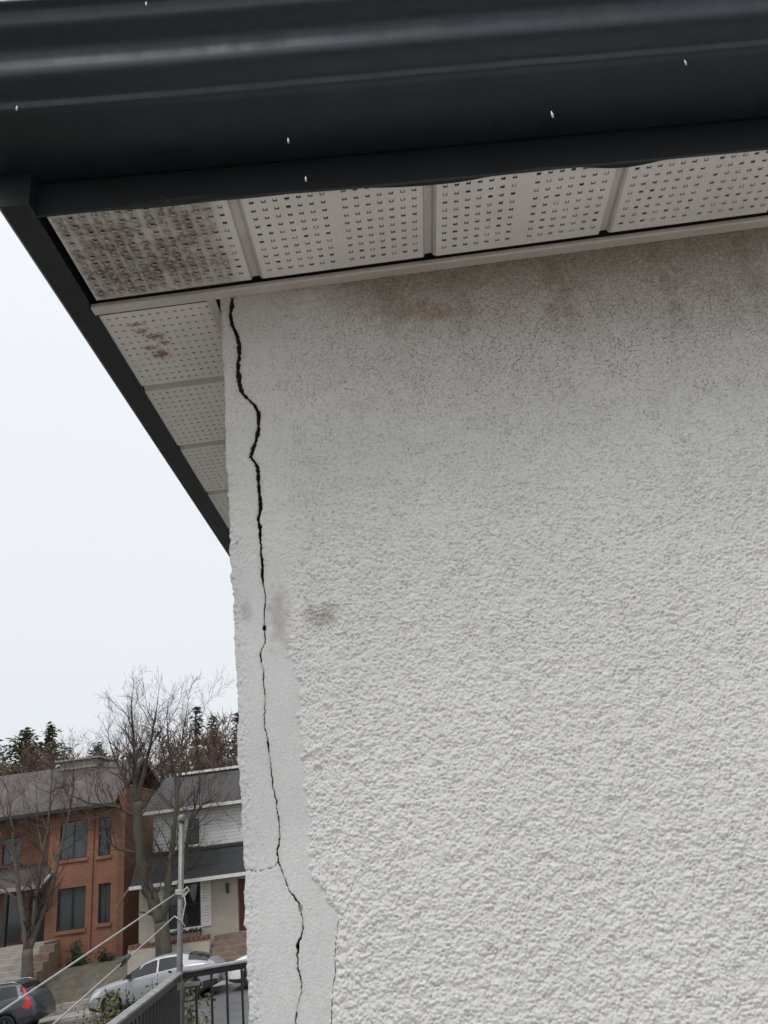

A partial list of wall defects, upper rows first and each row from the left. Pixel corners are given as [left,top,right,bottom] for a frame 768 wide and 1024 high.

damp [55,199,232,297]
crack [229,299,304,1023]